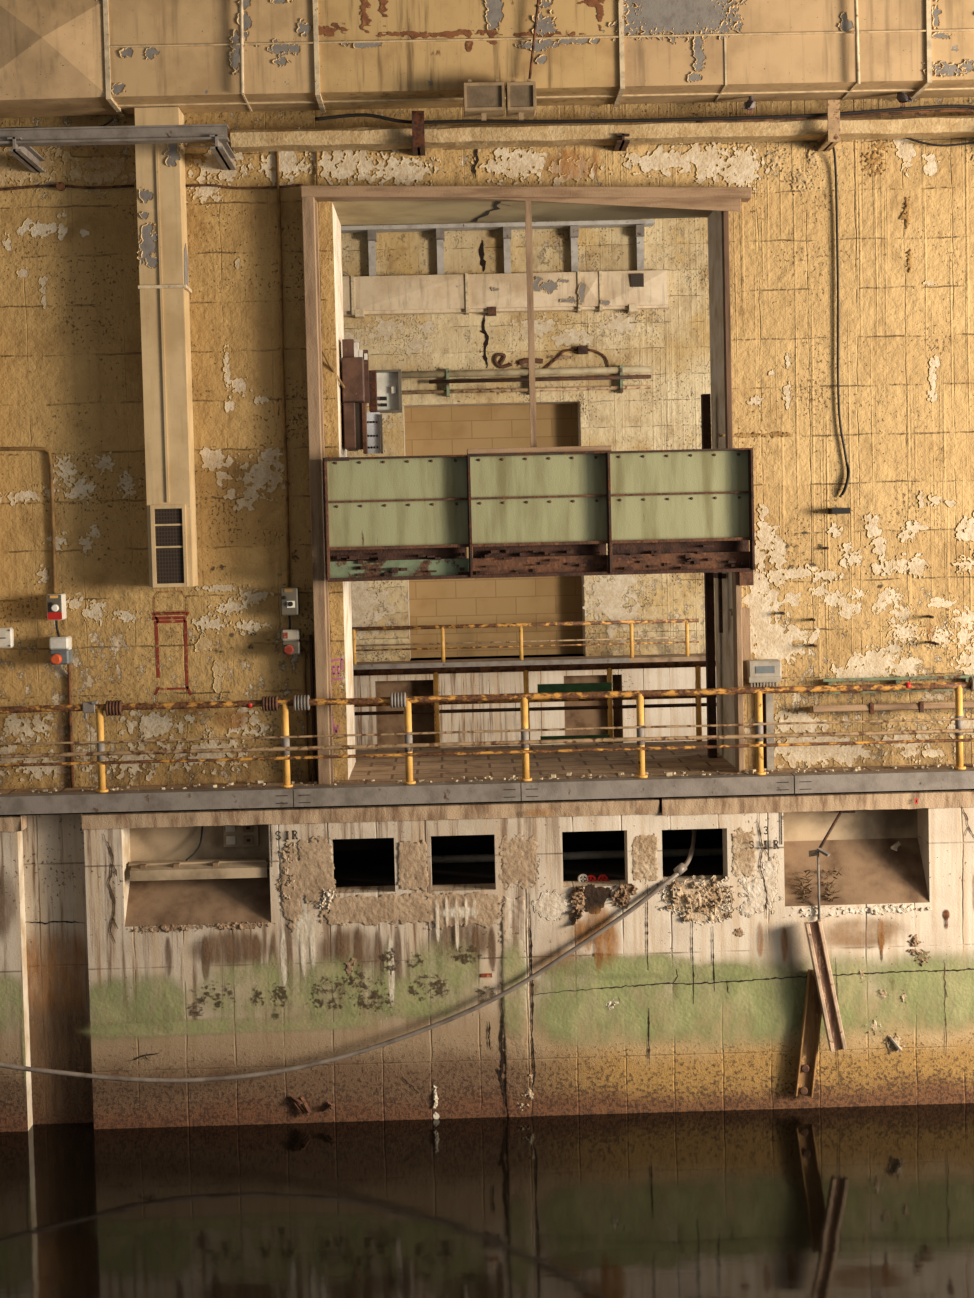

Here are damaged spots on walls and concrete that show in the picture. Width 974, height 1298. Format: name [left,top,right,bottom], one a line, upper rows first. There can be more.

corrosion [318,0,584,52]
corrosion [578,0,605,31]
peeling [164,143,448,208]
crack [480,315,489,368]
peeling [729,490,974,685]
peeling [0,701,273,786]
peeling [774,708,974,769]
leakage [187,897,496,1020]
corrosion [577,912,616,966]
leakage [833,922,893,949]
leakage [27,944,90,1115]
crack [488,885,974,1116]